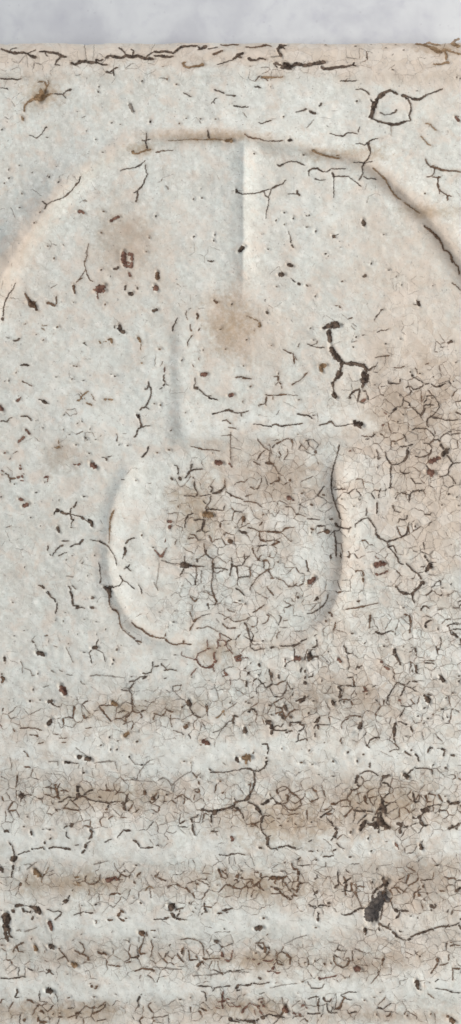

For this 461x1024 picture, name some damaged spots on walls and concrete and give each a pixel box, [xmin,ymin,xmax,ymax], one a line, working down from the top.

crack [0,38,461,294]
crack [0,309,461,1024]
spalling [363,877,390,935]